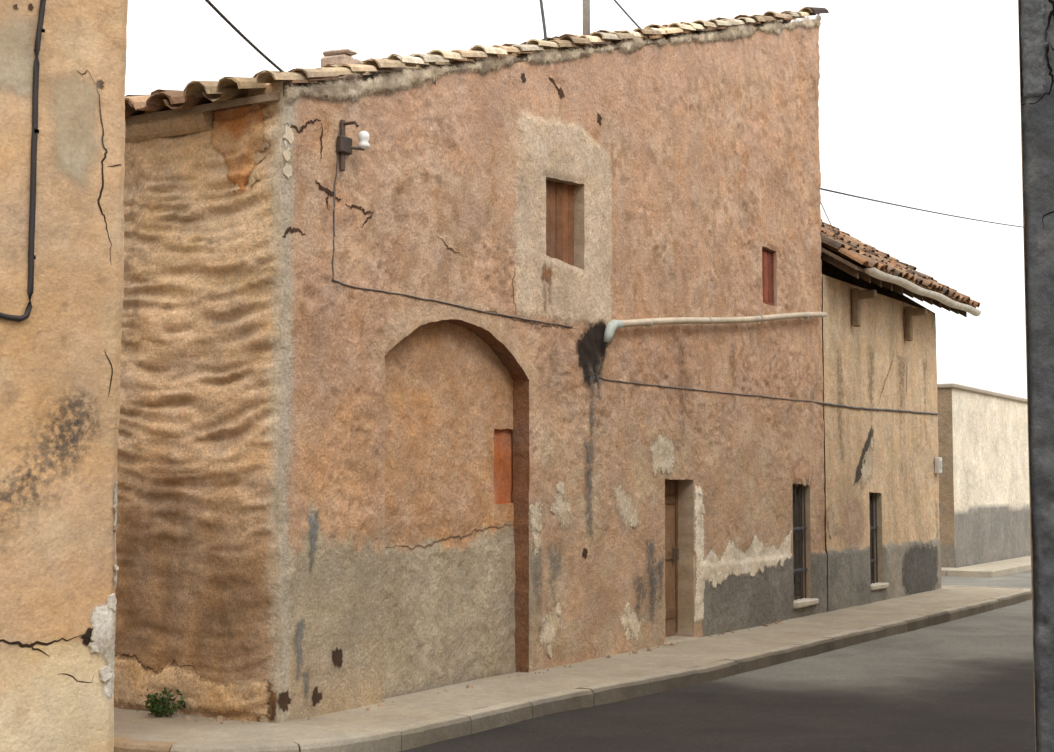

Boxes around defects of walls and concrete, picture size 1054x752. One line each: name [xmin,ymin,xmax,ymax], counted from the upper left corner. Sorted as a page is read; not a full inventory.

crack [1022,0,1054,105]
crack [78,70,121,261]
spalling [211,103,270,192]
flaking render [282,125,294,179]
flaking render [649,434,674,477]
flaking render [89,481,277,722]
damp [309,514,318,567]
crack [388,523,514,550]
flaking render [694,486,792,623]
damp [902,545,938,595]
crack [0,635,94,683]
damp [295,620,309,697]